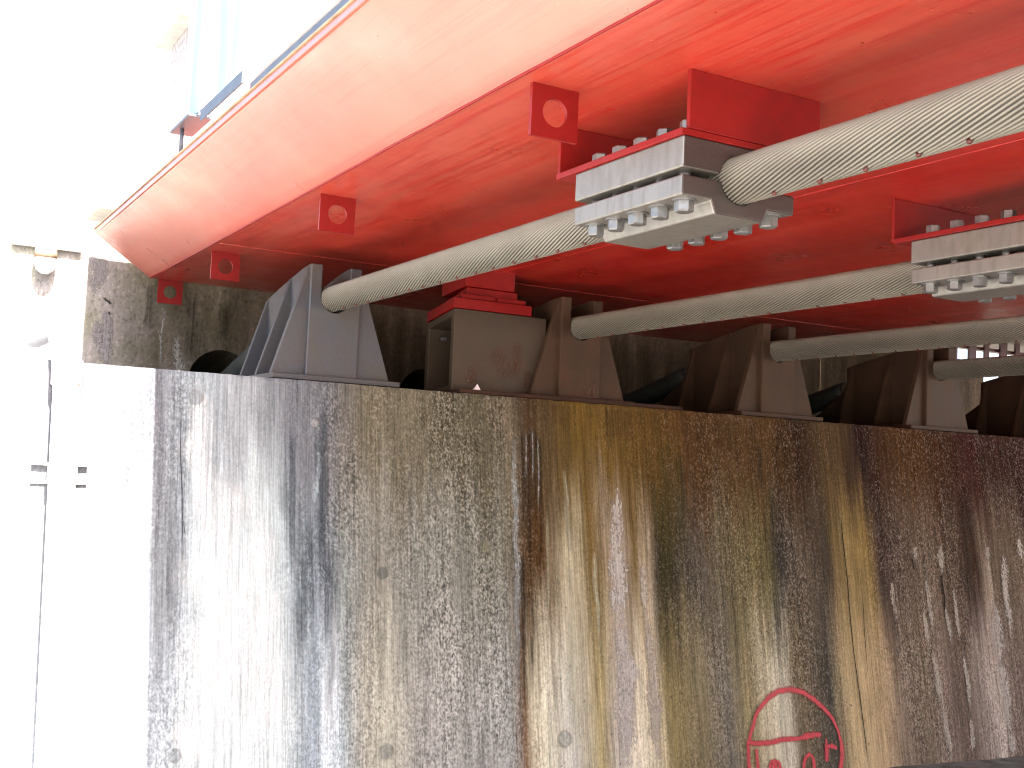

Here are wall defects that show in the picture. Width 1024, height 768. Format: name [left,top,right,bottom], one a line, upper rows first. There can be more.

damp [283,417,326,644]
crack [841,521,868,754]